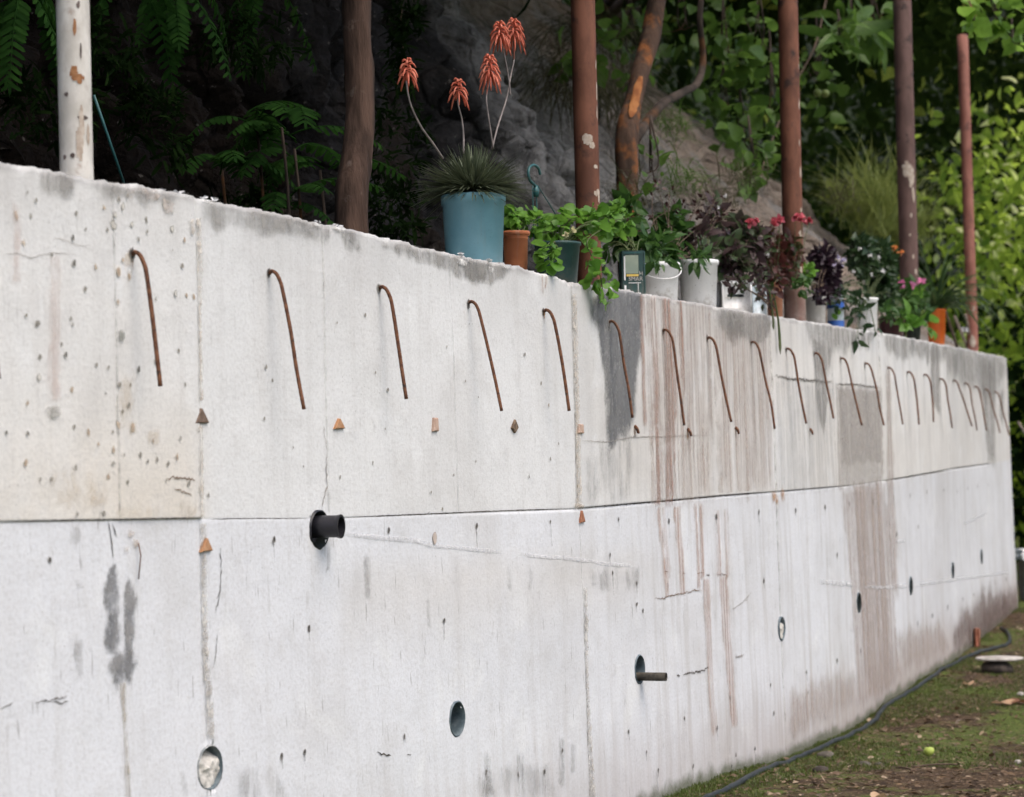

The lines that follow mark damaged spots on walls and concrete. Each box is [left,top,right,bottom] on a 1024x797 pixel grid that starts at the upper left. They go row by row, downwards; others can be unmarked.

leakage [592,290,642,448]
corrosion [635,298,692,582]
crack [5,475,194,553]
leakage [104,564,137,683]
crack [654,571,727,600]
corrosion [848,427,899,695]
crack [1,695,68,709]